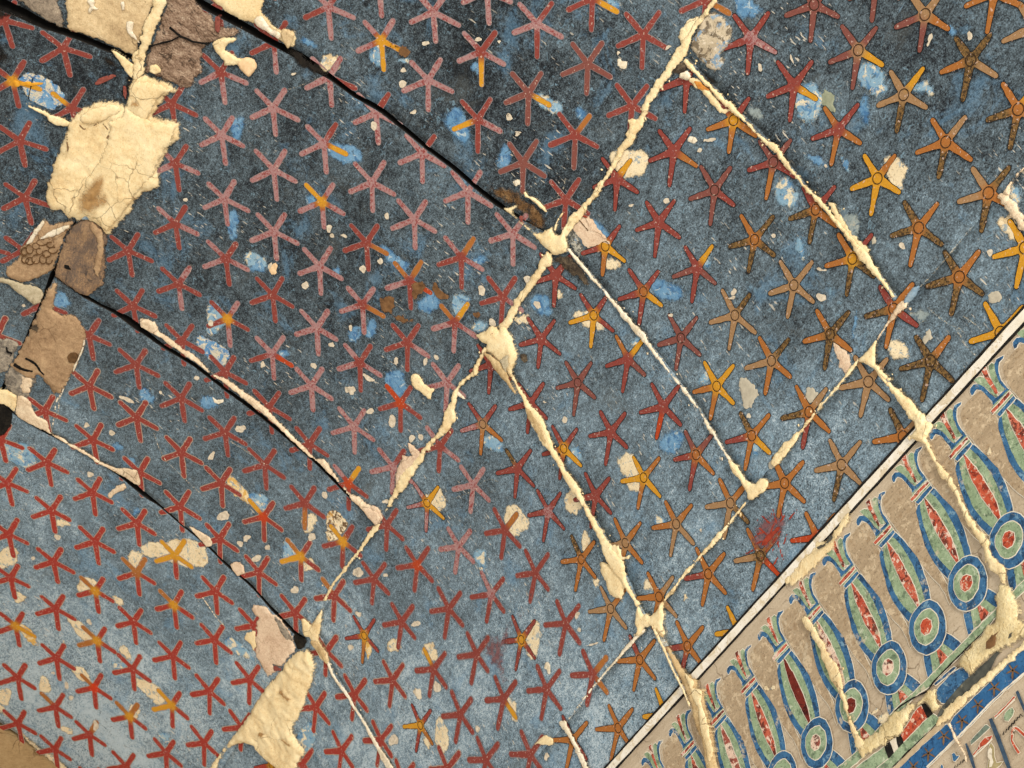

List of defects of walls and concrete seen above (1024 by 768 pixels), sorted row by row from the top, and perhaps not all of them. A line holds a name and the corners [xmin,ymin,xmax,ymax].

spalling [19,0,340,88]
spalling [678,12,732,71]
spalling [0,216,140,498]
crack [195,0,954,601]
peeling [128,527,212,569]
crack [1,259,350,637]
spalling [224,605,307,676]
crack [327,661,393,768]
crack [512,376,746,768]
crack [802,616,864,749]
crack [771,360,1006,584]
spalling [858,582,1024,758]